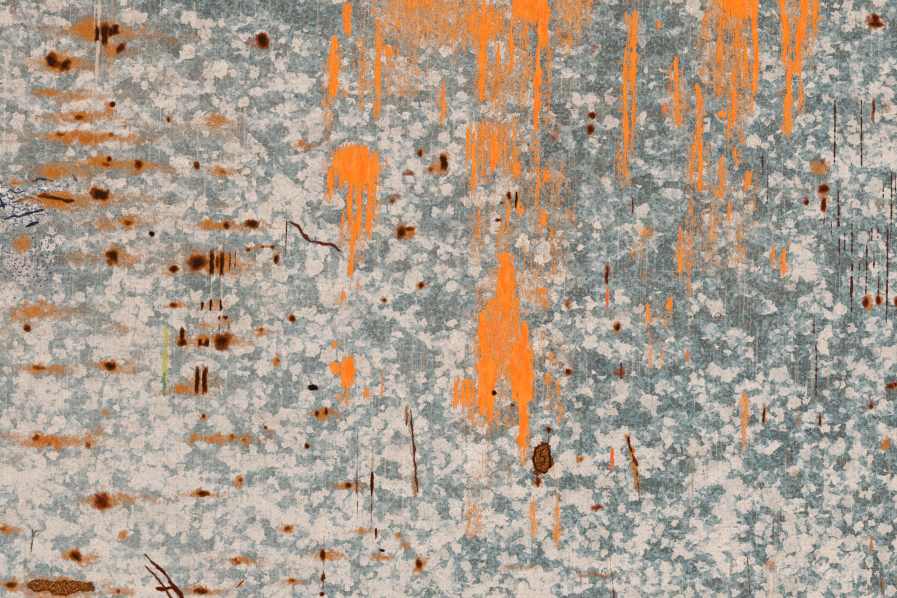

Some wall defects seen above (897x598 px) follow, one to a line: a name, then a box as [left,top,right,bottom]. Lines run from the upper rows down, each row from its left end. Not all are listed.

rust [58,17,156,58]
rust [26,50,95,74]
rust [587,112,597,135]
rust [428,153,449,175]
rust [804,98,897,323]
rust [166,245,280,277]
rust [167,366,215,398]
rust [624,435,642,504]
rust [1,574,95,598]